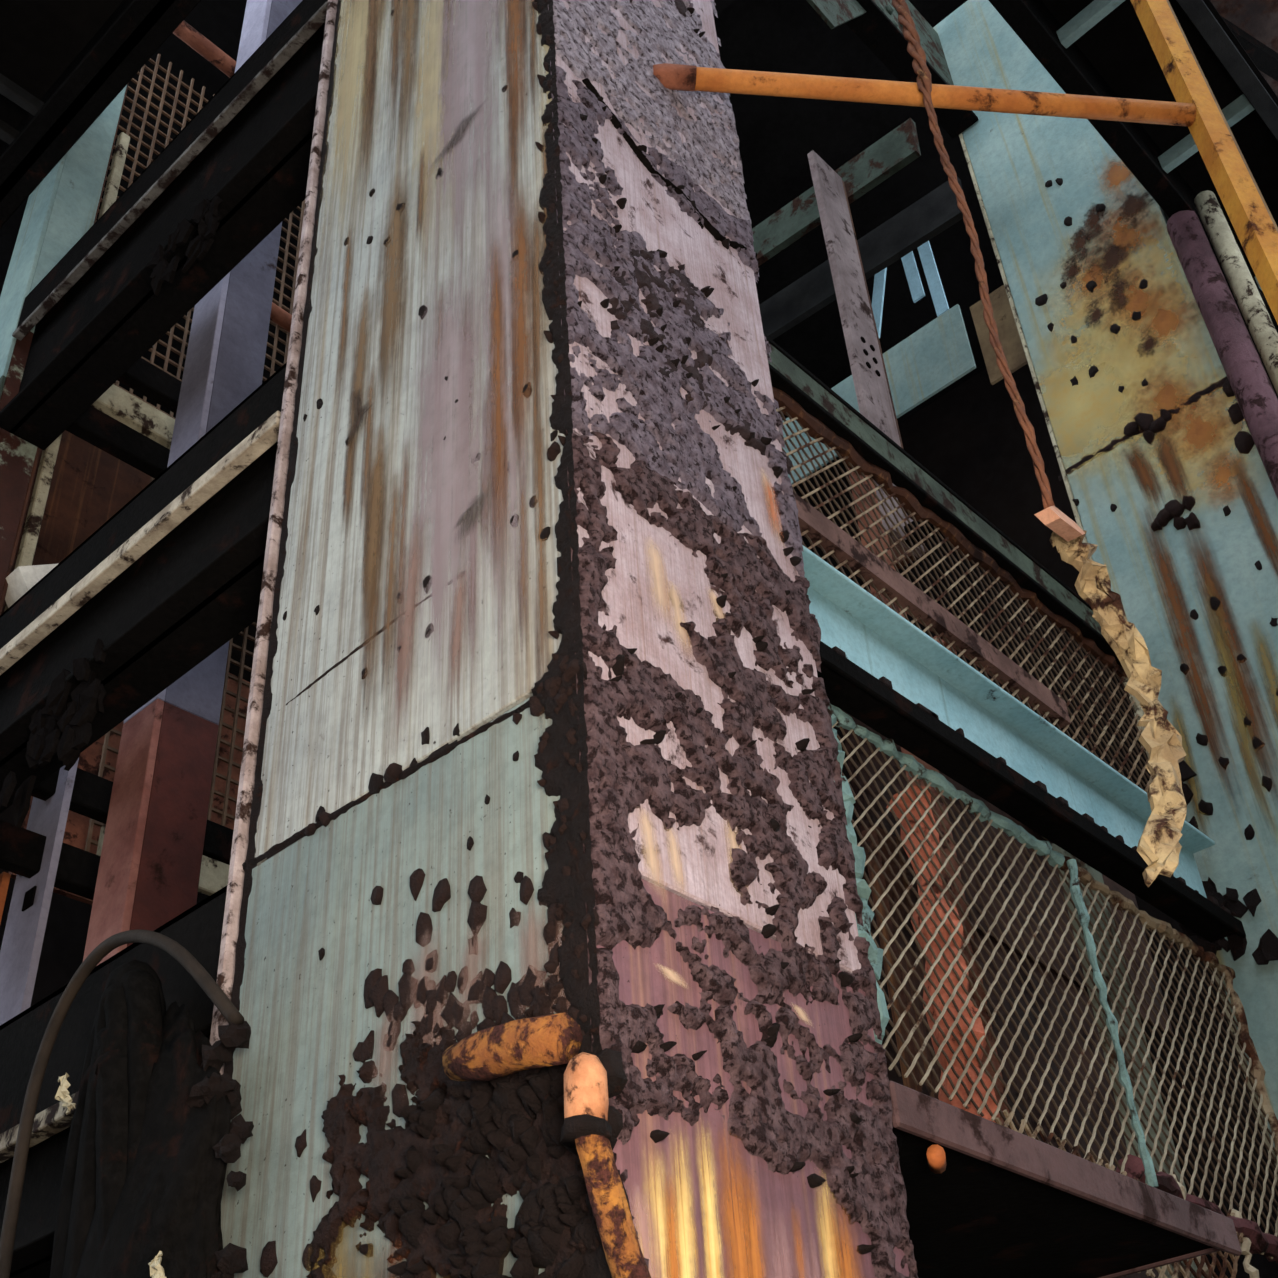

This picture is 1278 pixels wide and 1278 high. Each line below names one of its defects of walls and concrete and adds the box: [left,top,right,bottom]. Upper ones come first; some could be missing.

spalling [600,249,792,478]
corrosion [1040,162,1278,576]
corrosion [231,0,342,1011]
corrosion [306,0,612,1278]
corrosion [1150,526,1278,808]
spalling [368,758,417,795]
spalling [421,727,430,745]
peeling [640,730,666,745]
peeling [795,738,810,752]
corrosion [1175,709,1204,828]
peeling [761,904,780,939]
corrosion [637,1154,765,1278]